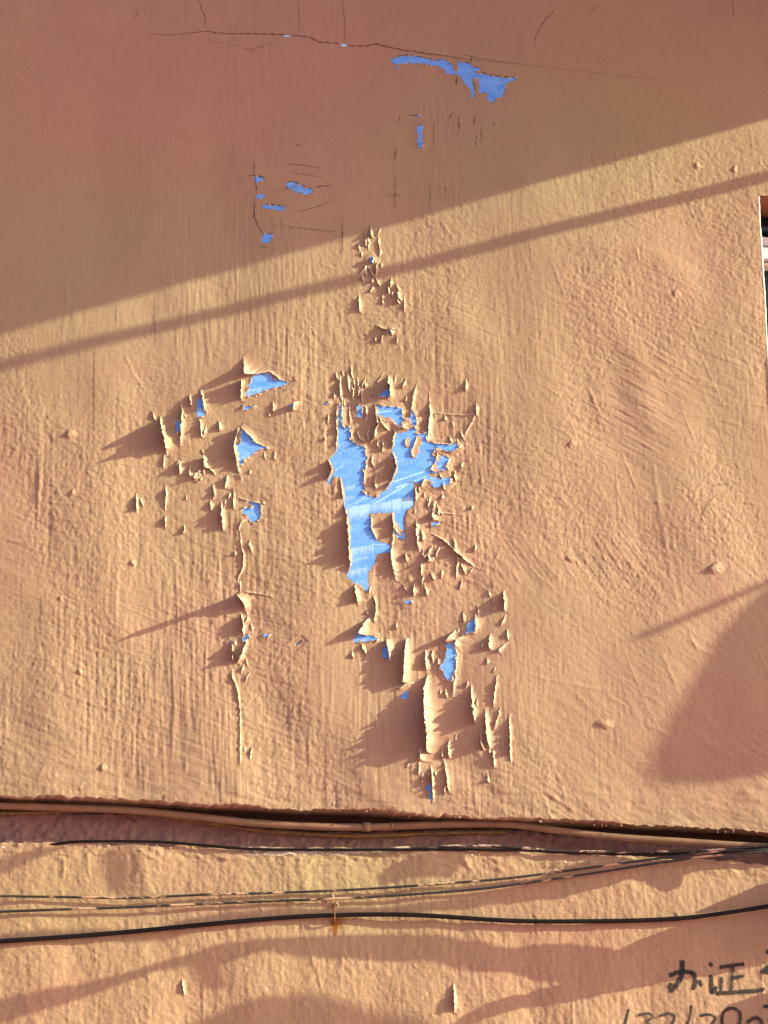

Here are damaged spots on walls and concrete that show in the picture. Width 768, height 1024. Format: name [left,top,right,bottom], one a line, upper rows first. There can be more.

crack [135,1,697,86]
peeling [388,54,518,102]
peeling [415,112,426,148]
crack [398,114,495,150]
peeling [254,175,315,212]
peeling [262,231,275,243]
peeling [358,225,407,315]
peeling [375,324,398,342]
peeling [152,354,305,765]
peeling [323,366,515,803]